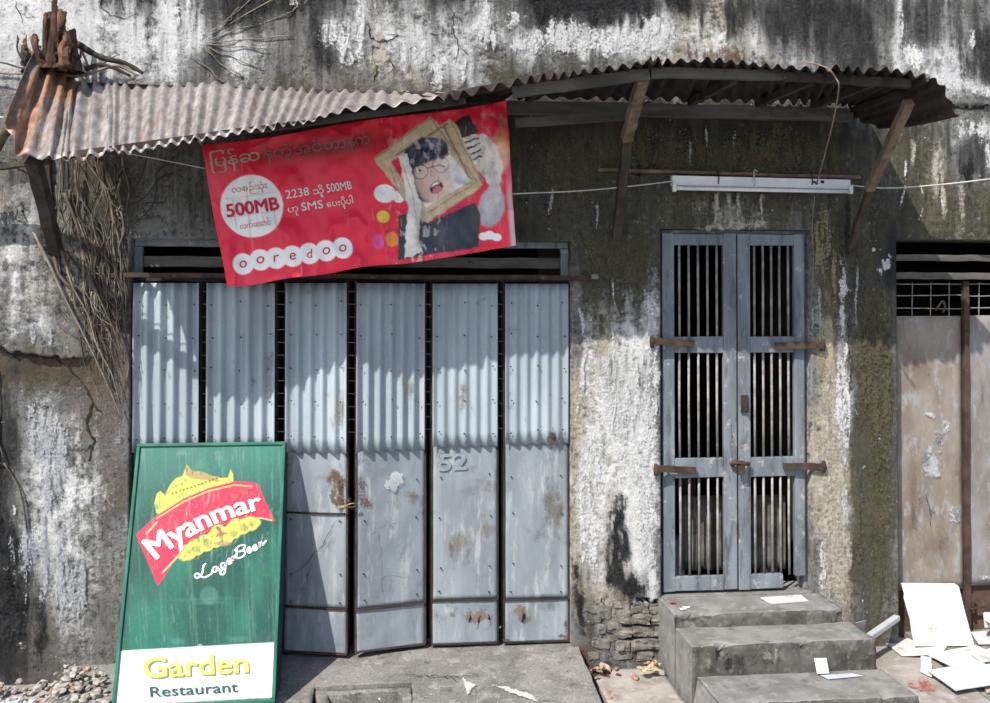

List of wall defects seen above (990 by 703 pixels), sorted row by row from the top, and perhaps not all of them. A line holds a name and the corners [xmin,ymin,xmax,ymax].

peeling [318,20,390,68]
peeling [431,50,467,89]
peeling [471,0,497,50]
peeling [507,10,532,53]
damp [521,0,704,57]
damp [897,0,990,97]
damp [528,133,660,598]
crack [0,349,102,462]
damp [811,193,892,620]
corrosion [326,469,372,512]
damp [0,401,88,654]
spalling [588,597,660,661]